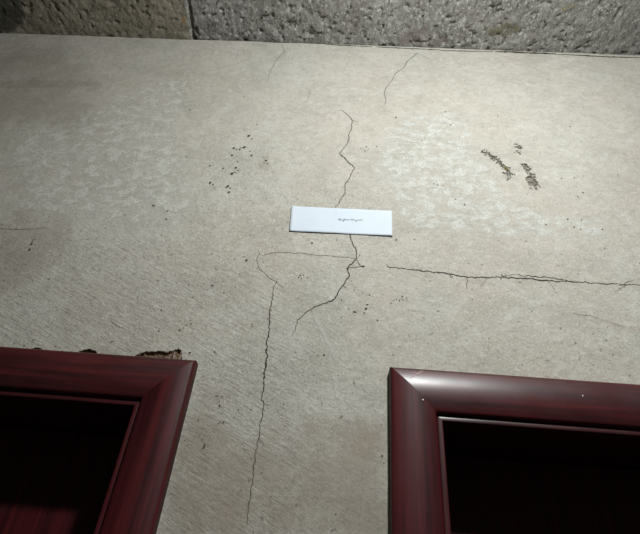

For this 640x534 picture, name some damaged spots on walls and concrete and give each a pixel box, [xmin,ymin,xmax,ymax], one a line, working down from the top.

crack [315,43,462,103]
crack [485,50,639,58]
crack [335,110,358,207]
spalling [481,149,515,181]
spalling [513,143,541,190]
crack [388,266,637,291]
spalling [135,348,191,359]
crack [247,234,362,524]